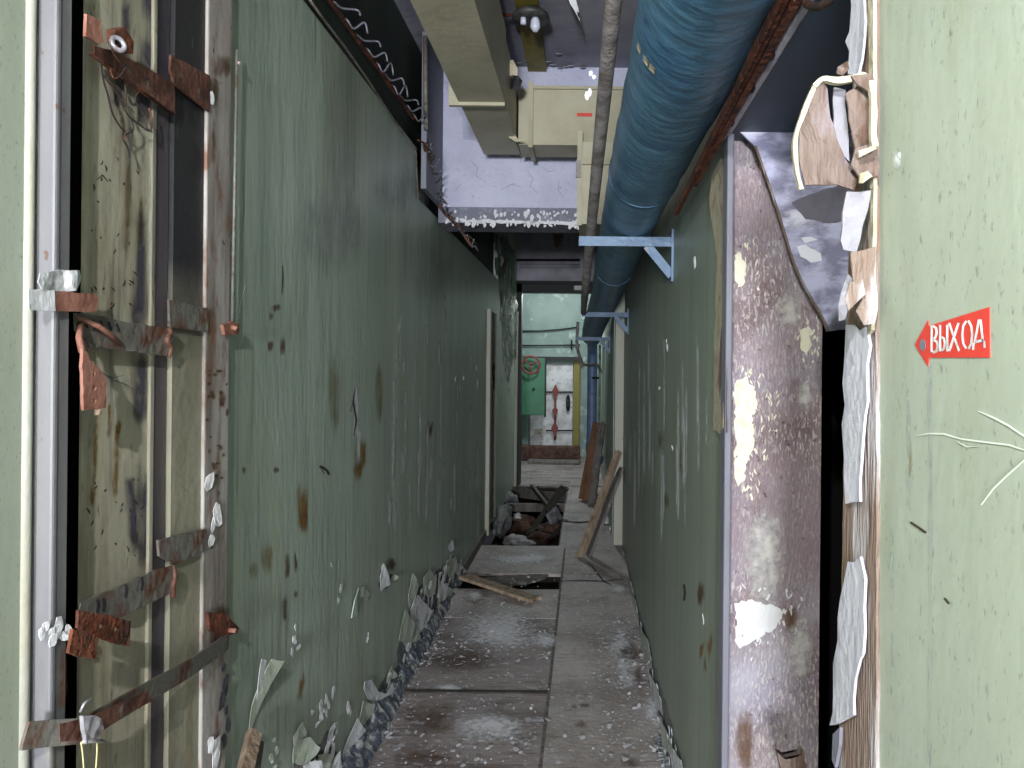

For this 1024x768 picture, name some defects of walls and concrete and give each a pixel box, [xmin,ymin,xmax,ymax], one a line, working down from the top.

peeling [445,209,579,383]
peeling [734,240,767,291]
peeling [777,296,820,363]
peeling [799,381,812,405]
rust [355,443,365,477]
peeling [732,366,780,500]
rust [299,494,307,529]
peeling [734,518,812,676]
peeling [293,540,467,768]